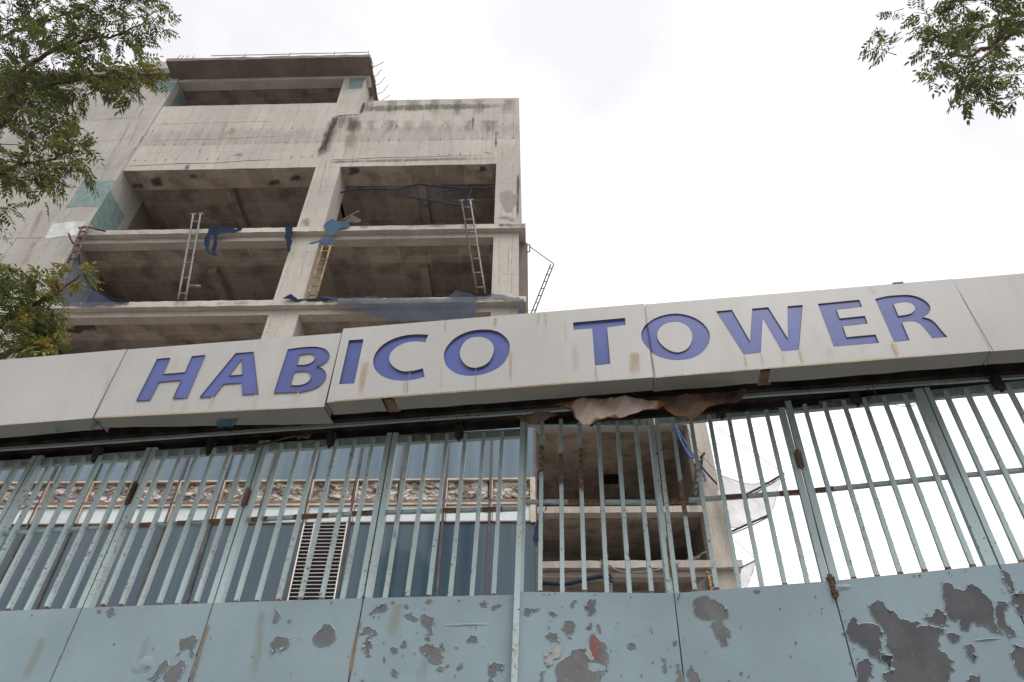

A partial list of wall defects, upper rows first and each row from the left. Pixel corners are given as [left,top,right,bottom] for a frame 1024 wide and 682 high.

damp [320,103,485,153]
peeling [312,623,337,647]
peeling [360,598,483,678]
peeling [523,594,612,682]
peeling [692,594,741,647]
peeling [841,569,1024,682]